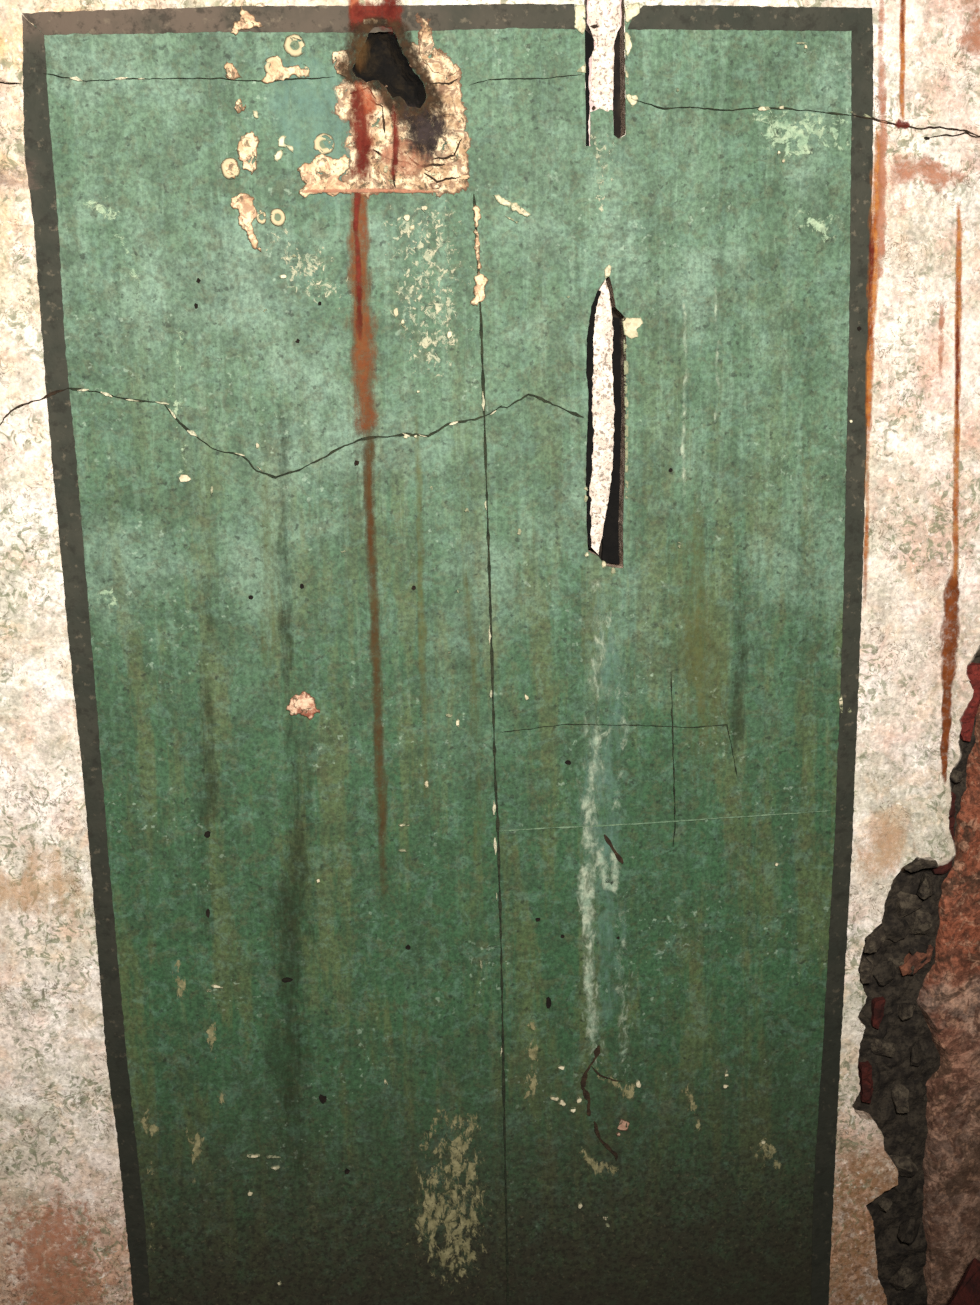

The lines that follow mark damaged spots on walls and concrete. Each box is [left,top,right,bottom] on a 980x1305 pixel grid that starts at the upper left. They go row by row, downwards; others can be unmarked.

crack [0,73,329,84]
peeling [221,98,348,305]
peeling [261,34,310,84]
rust [350,0,402,30]
spalling [274,13,489,376]
crack [636,100,980,138]
rust [866,0,962,435]
rust [350,86,420,834]
rust [938,207,962,782]
crack [0,195,831,1305]
leakage [579,725,618,1048]
spalling [852,645,980,1305]